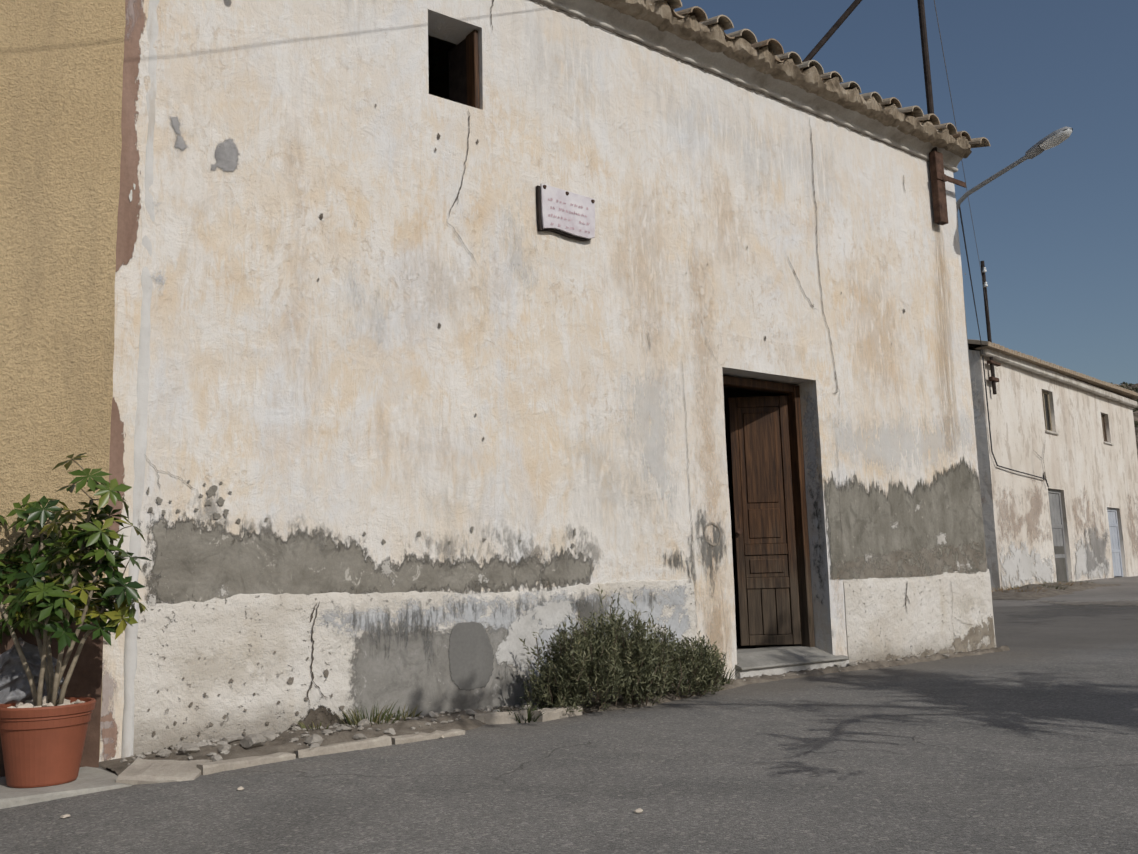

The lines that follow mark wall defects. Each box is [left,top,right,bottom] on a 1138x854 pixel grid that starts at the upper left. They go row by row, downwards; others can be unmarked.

crack [446,111,478,265]
crack [534,0,948,404]
peeling [108,398,126,534]
peeling [100,664,261,765]
crack [307,601,324,705]
flaking render [139,480,594,748]
leakage [320,510,726,682]
flaking render [823,456,988,580]
leakage [1084,527,1109,575]